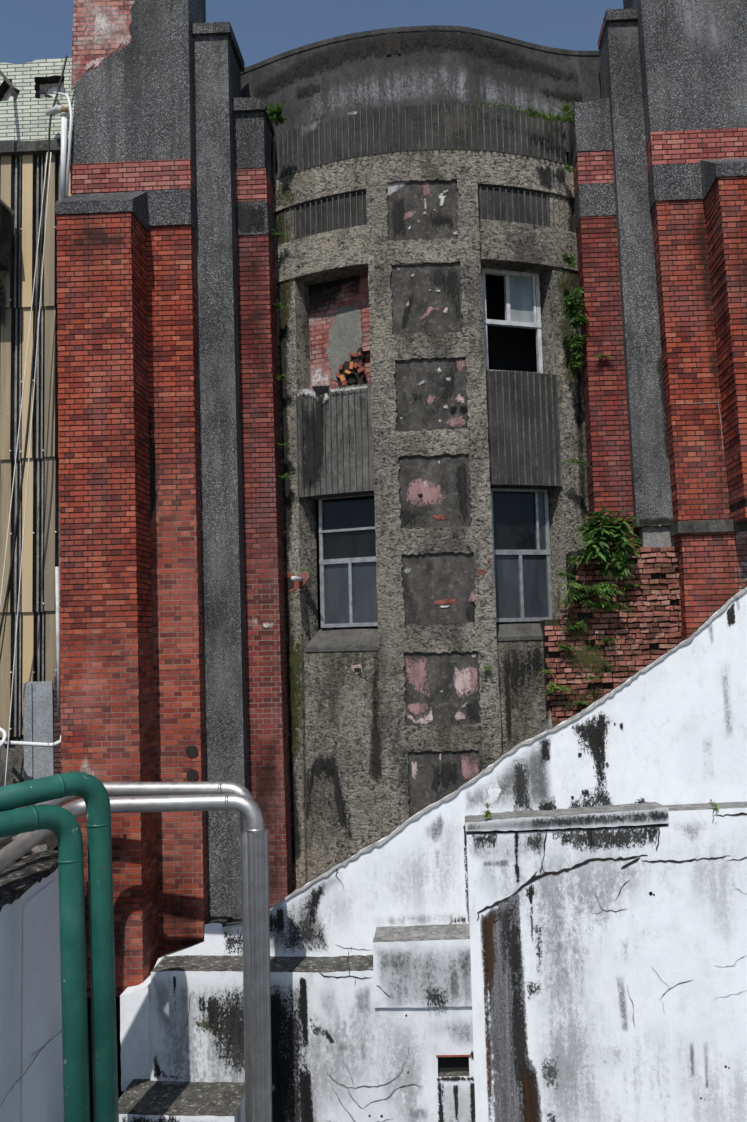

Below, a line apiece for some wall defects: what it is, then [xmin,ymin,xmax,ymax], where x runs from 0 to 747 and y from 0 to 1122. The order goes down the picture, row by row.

spalling [39,0,135,99]
spalling [297,348,368,407]
peeling [405,478,448,520]
leakage [252,592,351,867]
peeling [406,654,478,724]
leakage [449,711,669,999]
crack [477,824,747,921]
crack [712,812,747,823]
leakage [173,976,245,1074]
leakage [270,977,334,1122]
crack [323,1047,424,1122]
corrosion [480,892,542,1122]